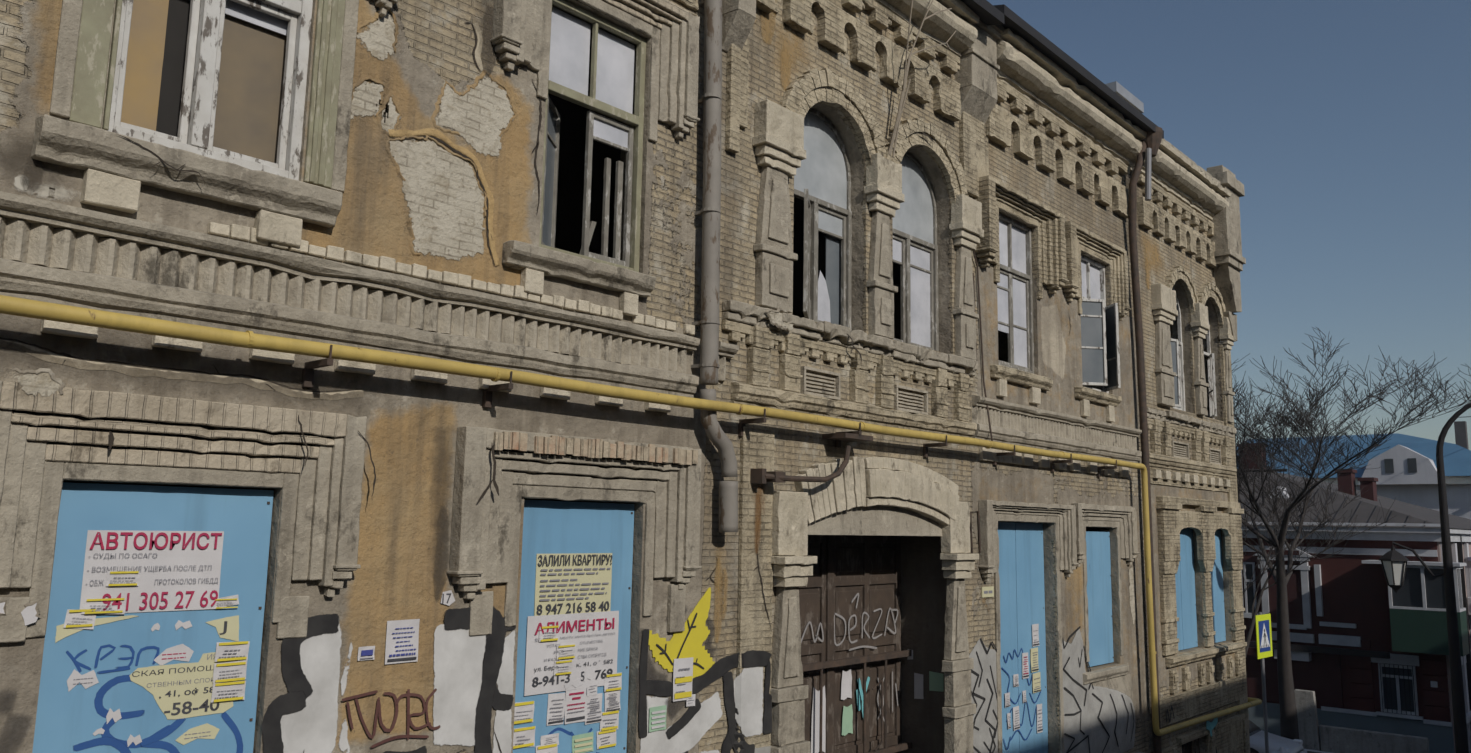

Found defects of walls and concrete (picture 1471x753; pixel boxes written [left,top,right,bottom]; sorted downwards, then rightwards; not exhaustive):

flaking render [357,10,399,61]
flaking render [351,70,517,263]